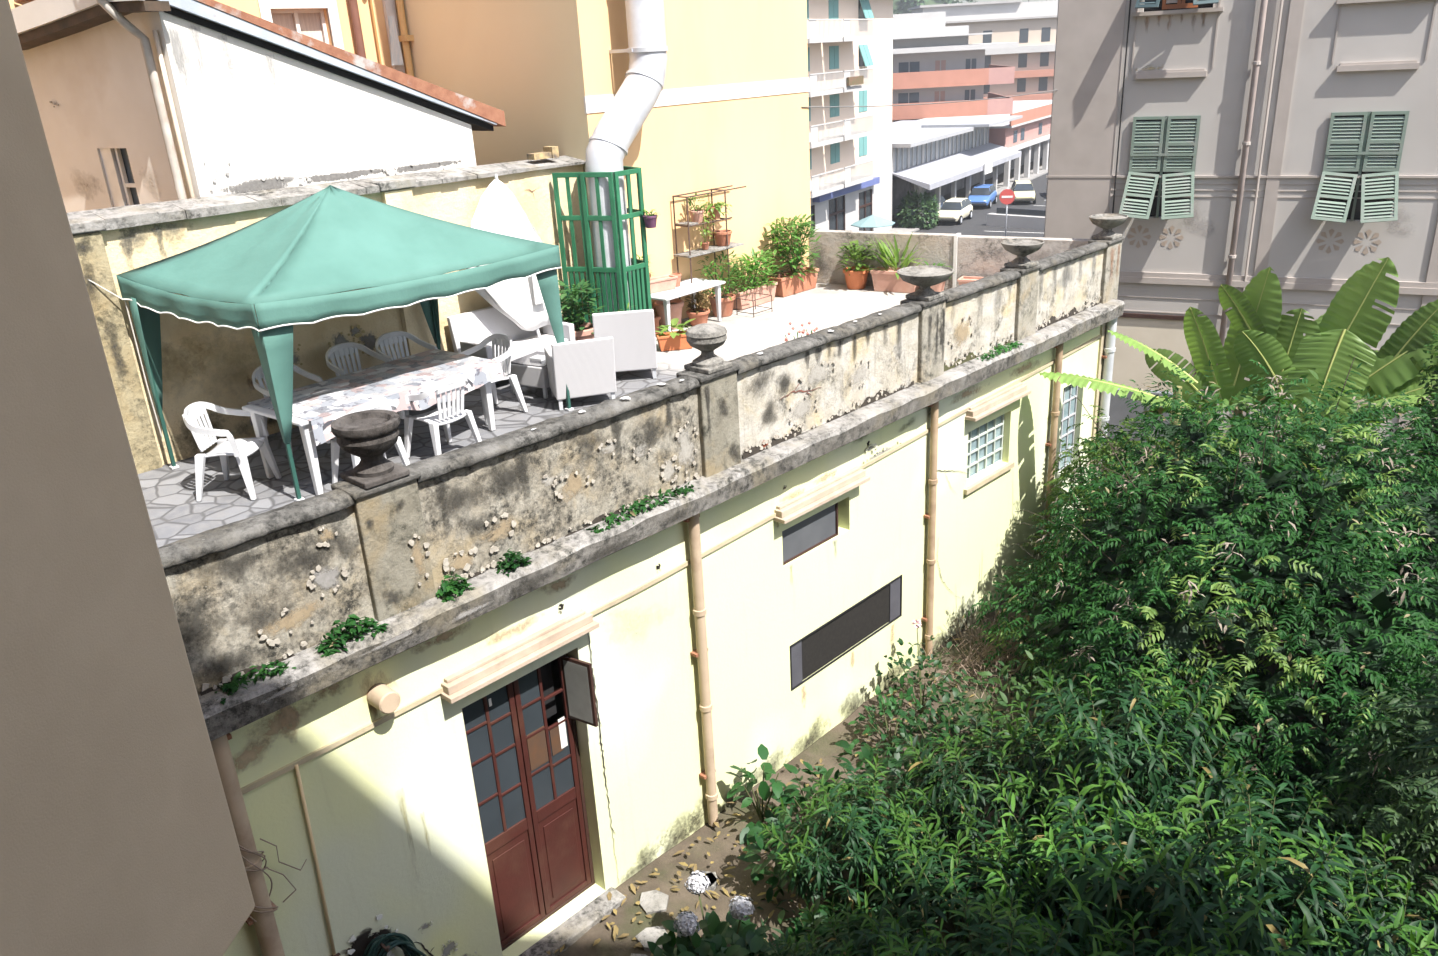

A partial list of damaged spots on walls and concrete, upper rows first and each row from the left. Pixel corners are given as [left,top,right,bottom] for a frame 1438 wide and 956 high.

leakage [805,321,902,364]
leakage [705,386,728,421]
leakage [755,373,790,421]
leakage [198,550,255,576]
leakage [277,529,354,572]
leakage [242,609,281,628]
leakage [206,650,253,678]